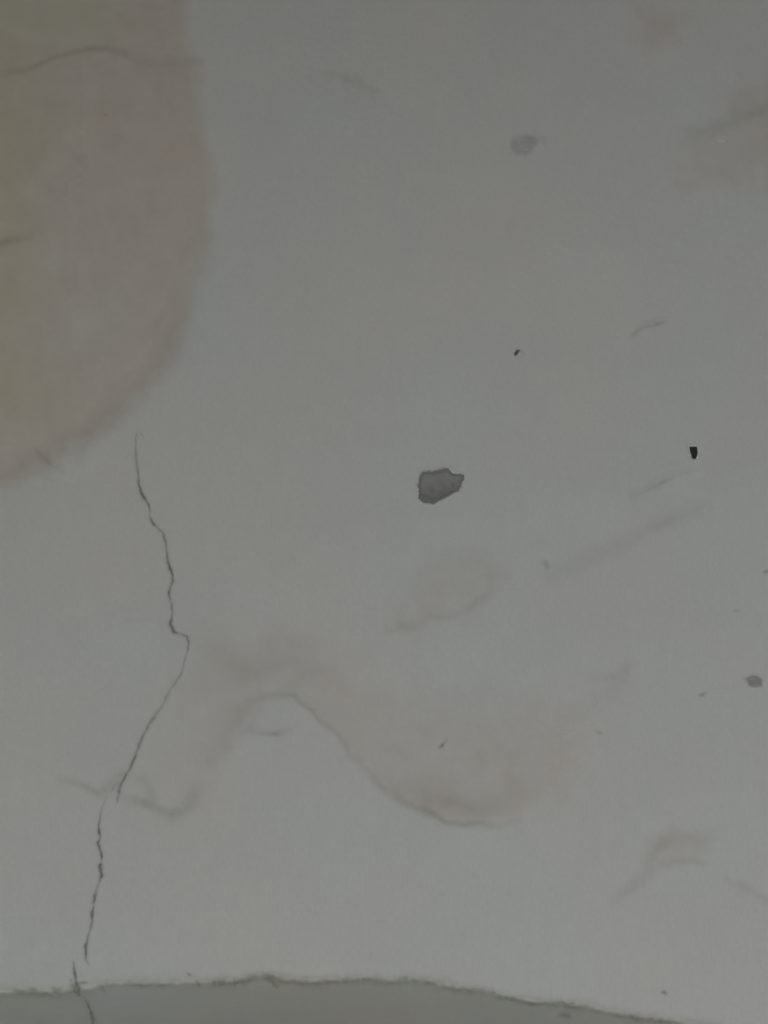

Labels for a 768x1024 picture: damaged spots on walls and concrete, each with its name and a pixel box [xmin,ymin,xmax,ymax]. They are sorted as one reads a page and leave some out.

peeling [415,465,467,507]
crack [168,562,176,633]
crack [91,829,103,918]
crack [74,943,93,1021]